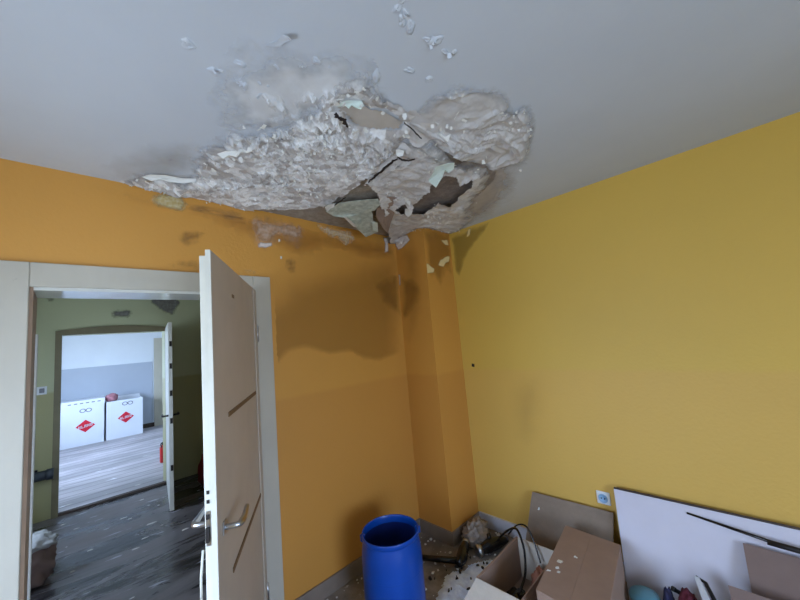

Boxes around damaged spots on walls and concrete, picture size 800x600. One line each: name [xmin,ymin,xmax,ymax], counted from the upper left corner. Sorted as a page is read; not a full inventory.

peeling [119,80,532,252]
crack [366,156,415,185]
peeling [427,256,450,273]